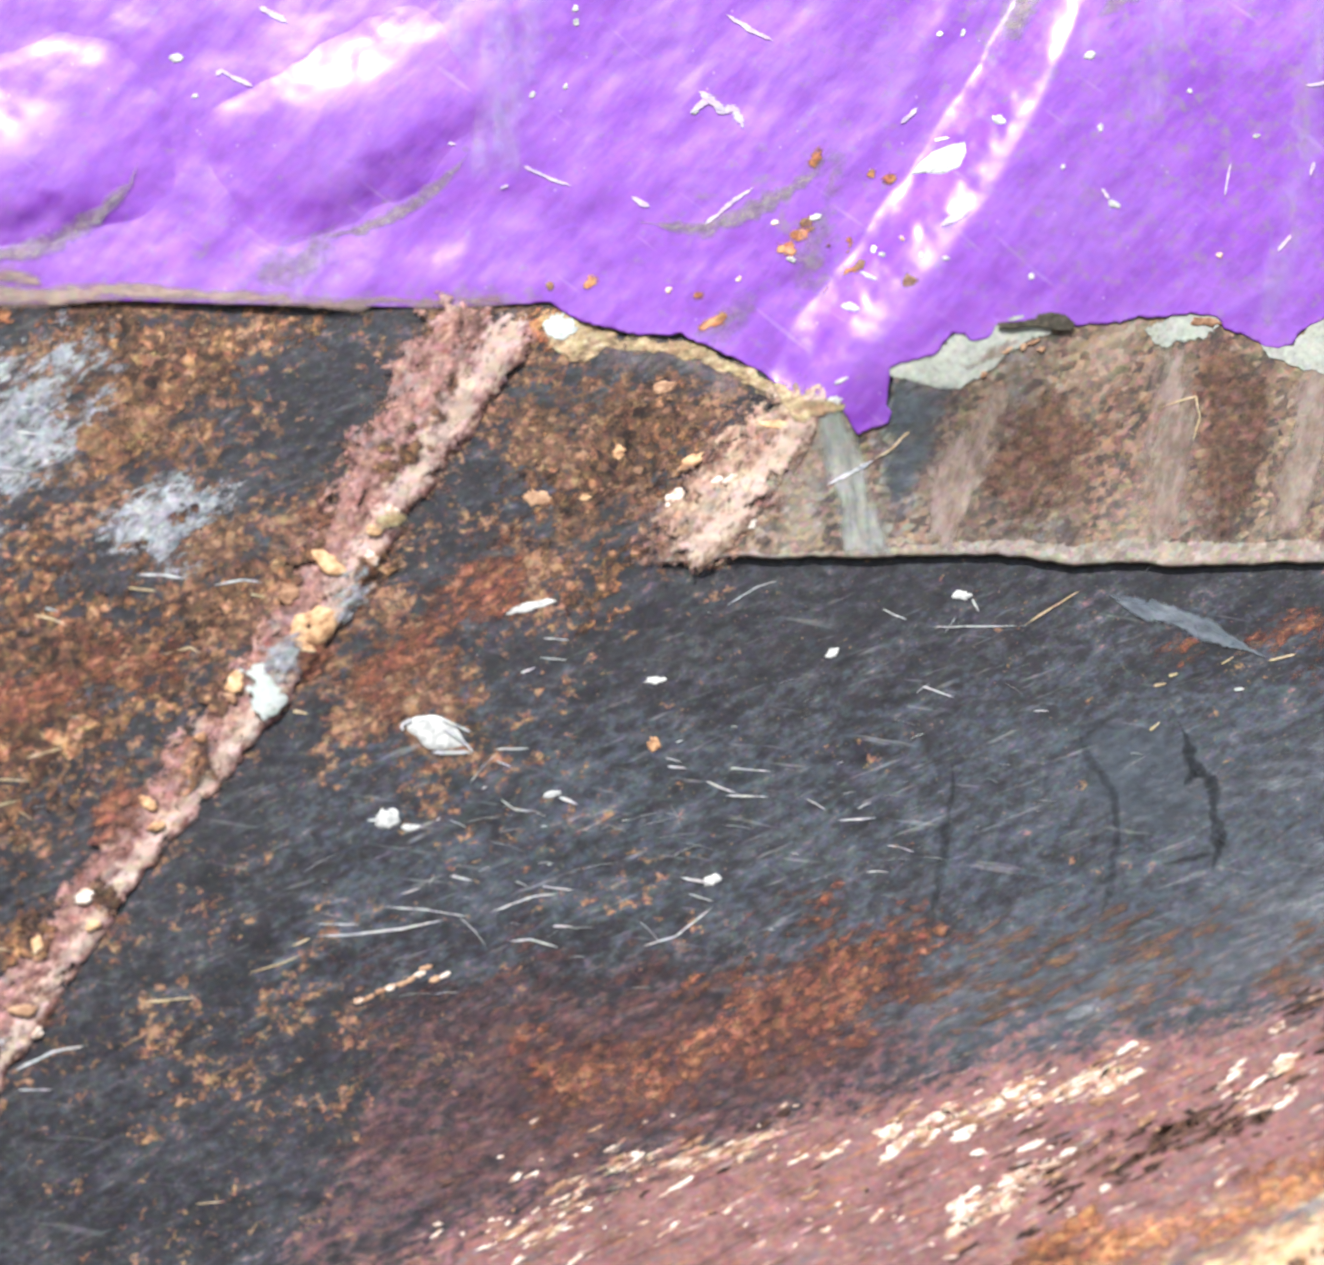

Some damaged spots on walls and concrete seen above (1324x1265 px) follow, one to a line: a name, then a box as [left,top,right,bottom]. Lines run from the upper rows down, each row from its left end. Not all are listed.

peeling [542,311,849,423]
peeling [890,312,1075,389]
peeling [1145,313,1222,348]
corrosion [888,387,1090,547]
peeling [1262,320,1324,533]
peeling [96,468,242,579]
corrosion [0,302,482,877]
peeling [238,623,311,720]
crack [1179,740,1224,865]
corrosion [0,886,64,971]
corrosion [76,877,123,917]
corrosion [355,882,1230,1211]